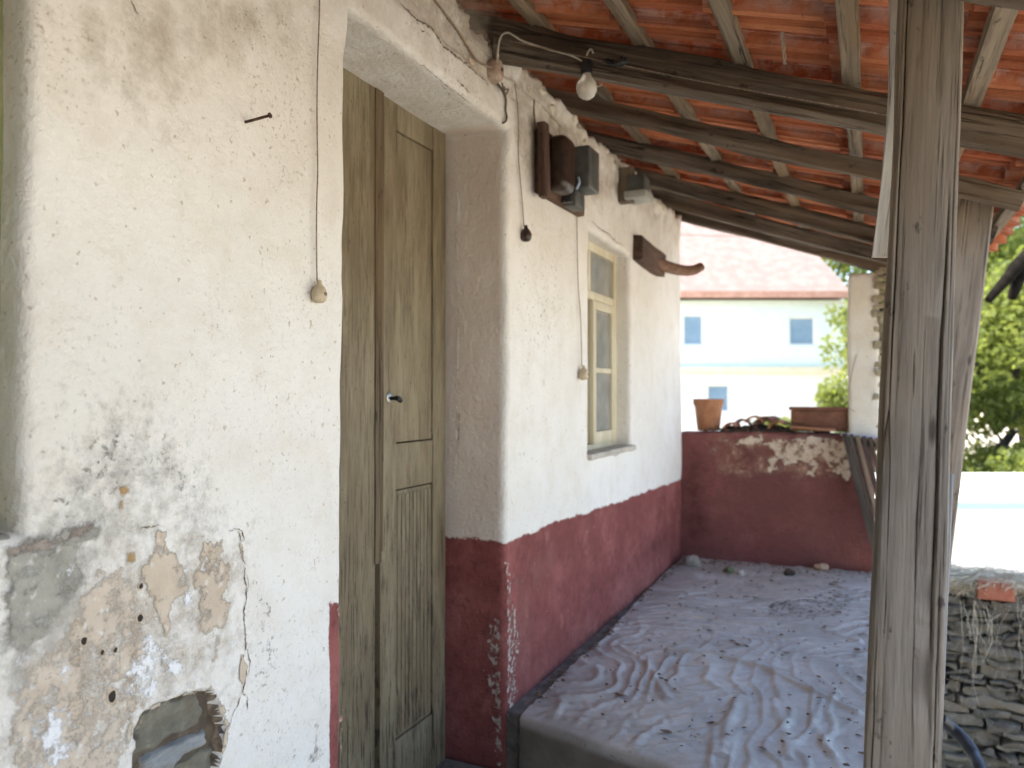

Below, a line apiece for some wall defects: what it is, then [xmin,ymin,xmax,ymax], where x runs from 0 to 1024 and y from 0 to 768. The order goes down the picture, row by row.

peeling [714,415,851,481]
peeling [1,524,231,768]
crack [230,528,251,724]
peeling [487,564,519,766]